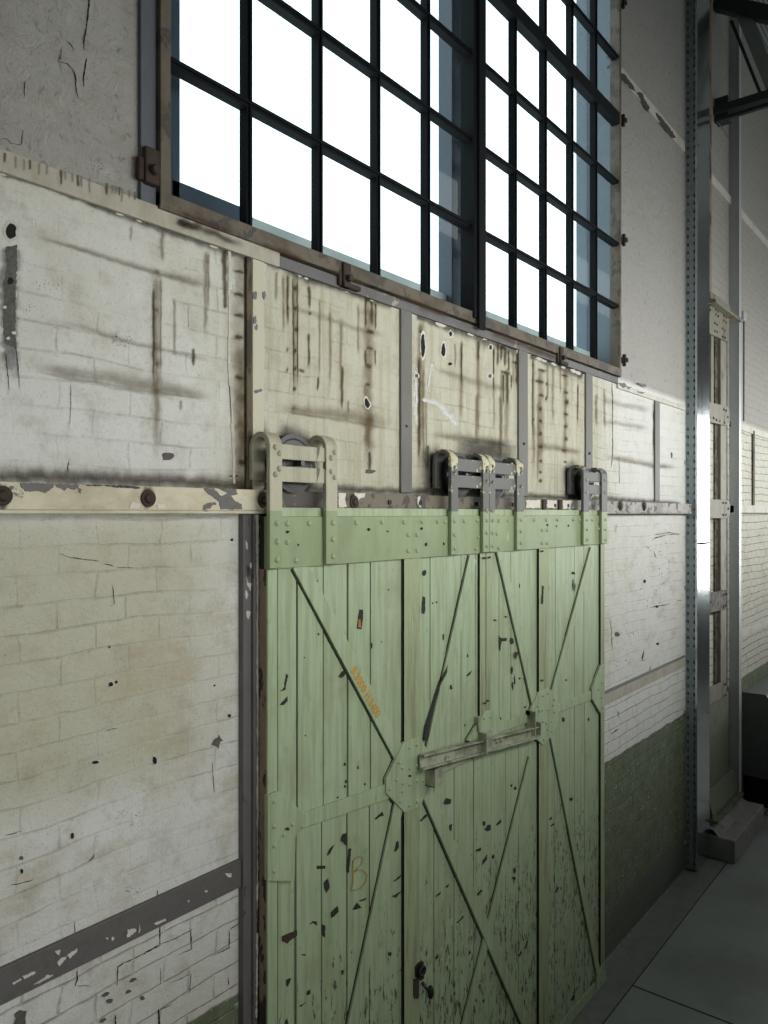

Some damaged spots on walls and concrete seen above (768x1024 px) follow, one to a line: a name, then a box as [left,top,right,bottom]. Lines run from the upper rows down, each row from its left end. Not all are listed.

crack [57,0,90,98]
peeling [621,73,676,138]
water stain [222,251,243,317]
peeling [68,196,244,510]
water stain [532,363,547,482]
peeling [20,483,140,494]
peeling [12,948,77,985]